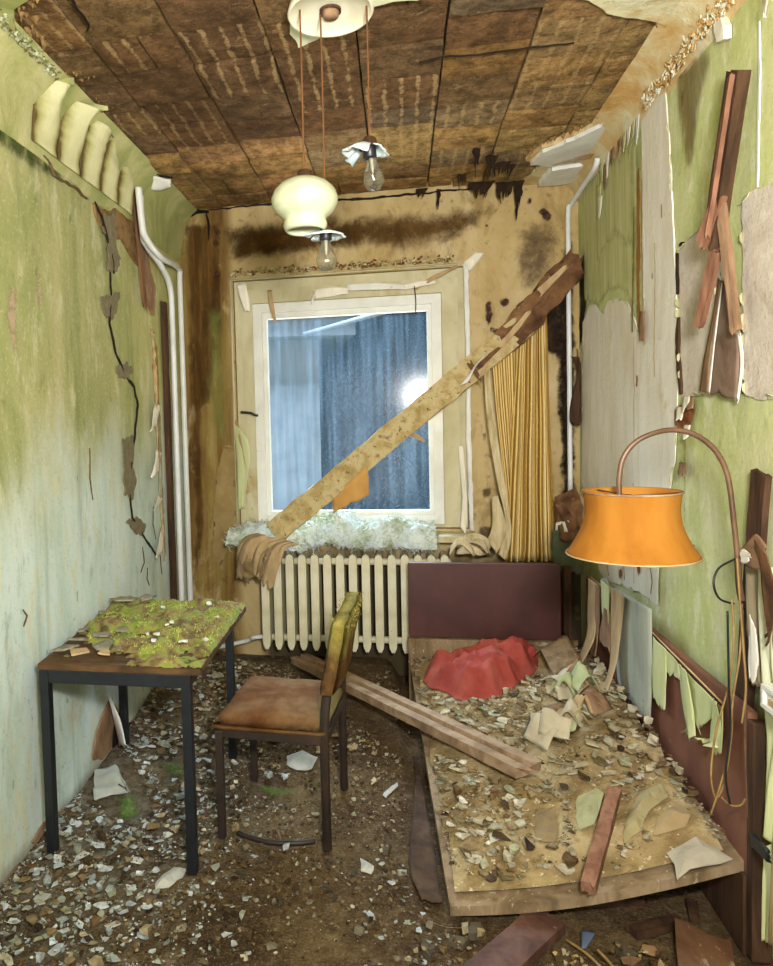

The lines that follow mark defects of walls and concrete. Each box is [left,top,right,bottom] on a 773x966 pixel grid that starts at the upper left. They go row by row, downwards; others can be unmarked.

spalling [0,0,735,489]
water stain [486,298,509,333]
water stain [521,232,550,281]
peeling [50,626,130,656]
peeling [98,594,157,615]
peeling [150,329,166,562]
flaking render [213,418,250,565]
water stain [187,213,487,564]
peeling [459,386,474,533]
water stain [480,527,492,557]
peeling [579,563,660,693]
peeling [652,632,723,758]